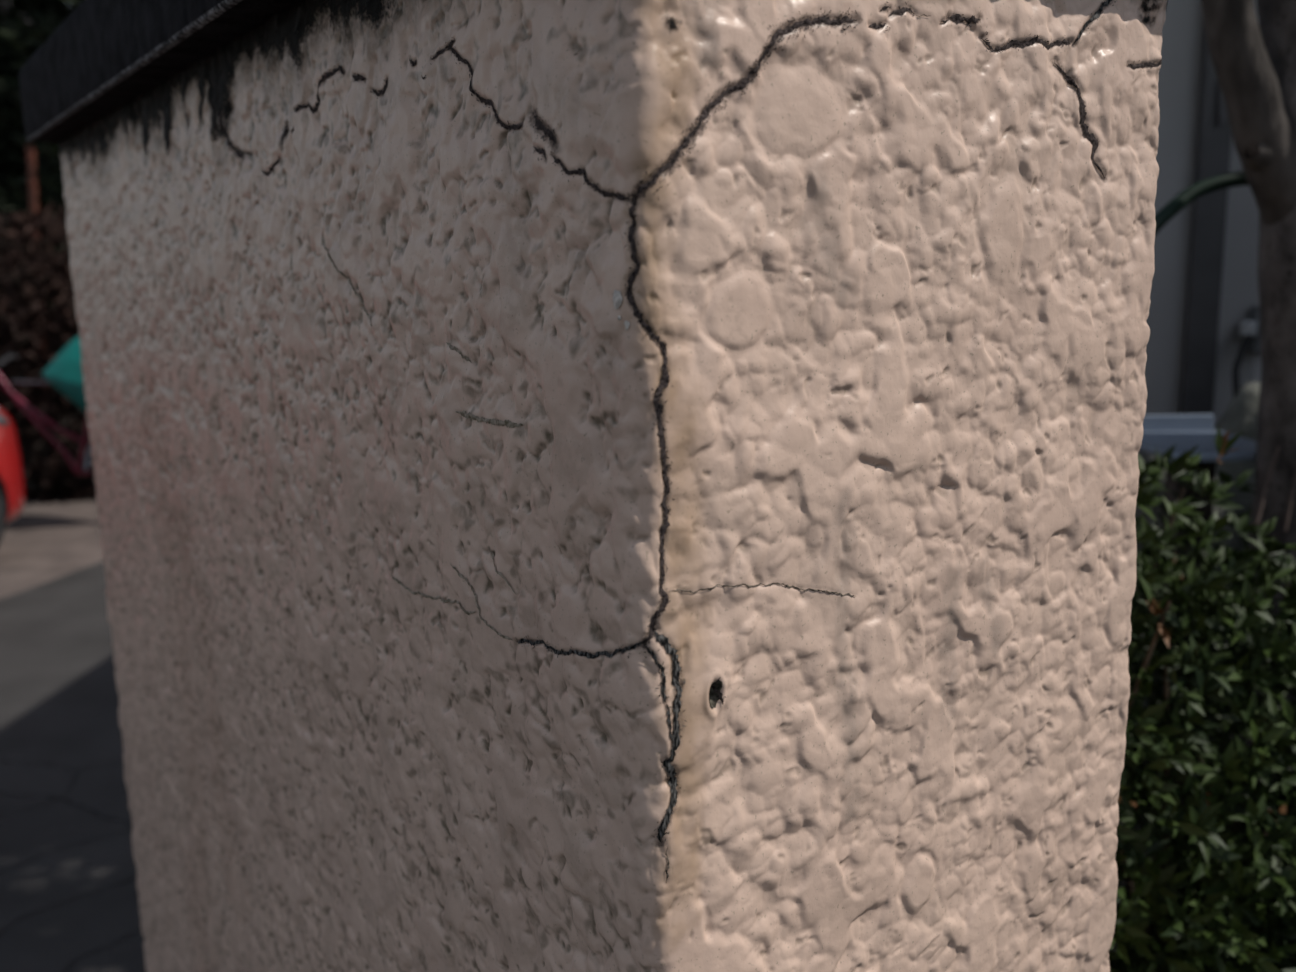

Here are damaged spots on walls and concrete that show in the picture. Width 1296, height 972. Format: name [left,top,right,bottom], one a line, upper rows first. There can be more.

damp [59,0,394,188]
crack [1127,58,1162,69]
crack [217,0,1117,882]